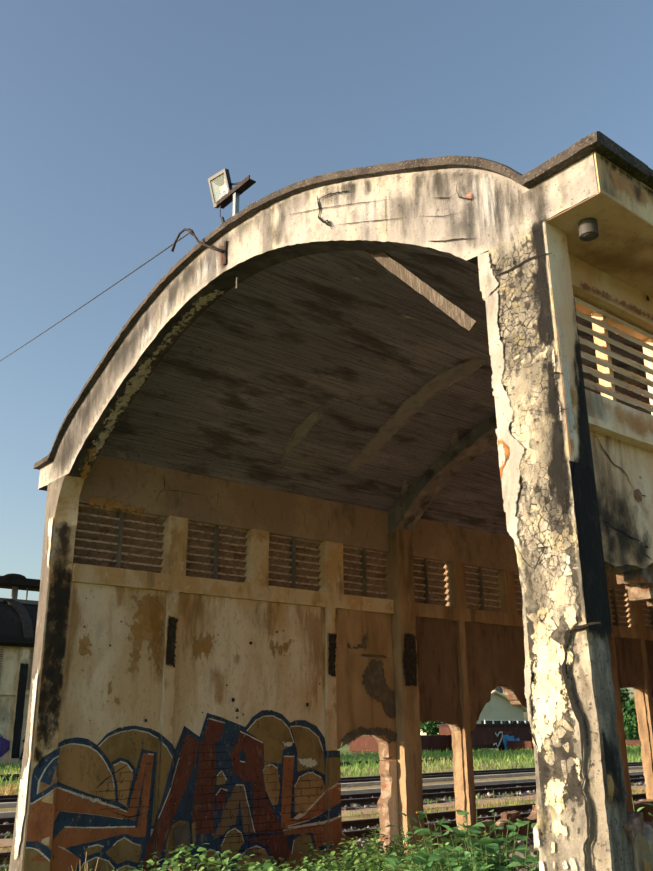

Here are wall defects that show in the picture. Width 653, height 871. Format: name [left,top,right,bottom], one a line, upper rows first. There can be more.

crack [290,190,406,227]
crack [427,180,478,217]
peeling [88,290,224,462]
spalling [498,440,509,477]
peeling [552,318,579,454]
water stain [531,217,650,640]
crack [593,435,645,496]
water stain [34,523,71,761]
peeling [120,594,178,673]
crack [489,238,601,871]
peeling [530,603,573,753]
peeling [564,606,577,628]